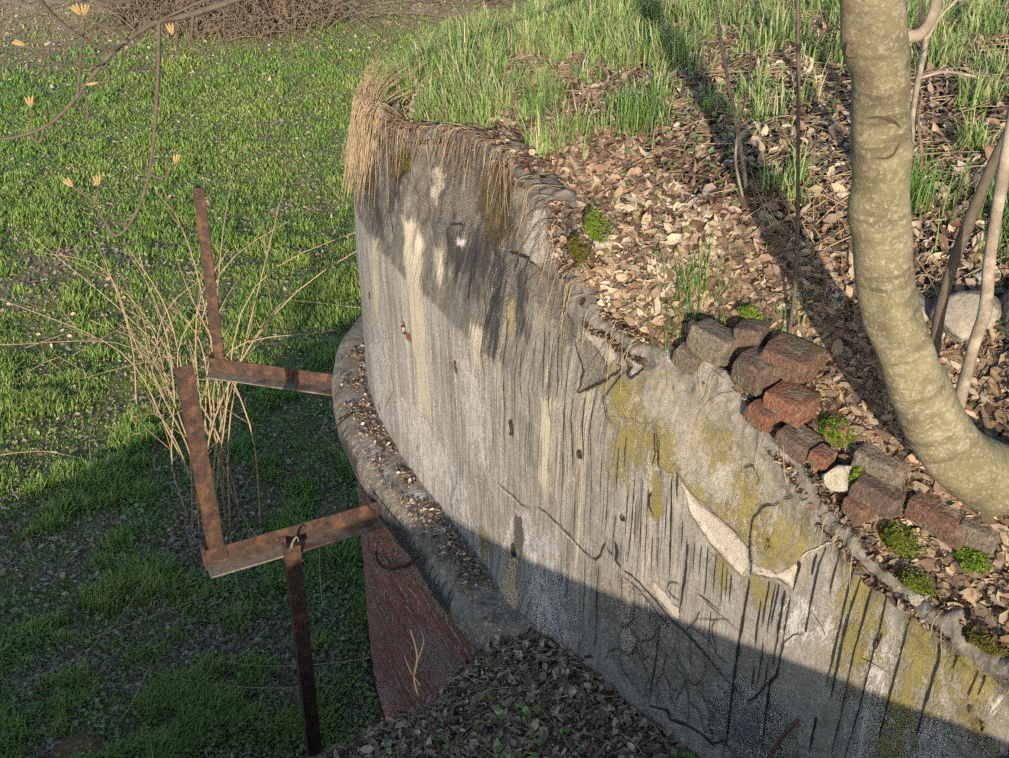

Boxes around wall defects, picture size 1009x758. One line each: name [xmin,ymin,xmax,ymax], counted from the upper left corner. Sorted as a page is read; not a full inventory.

crack [475,478,772,752]
damp [358,152,1009,758]
spalling [681,481,830,589]
crack [779,614,826,655]